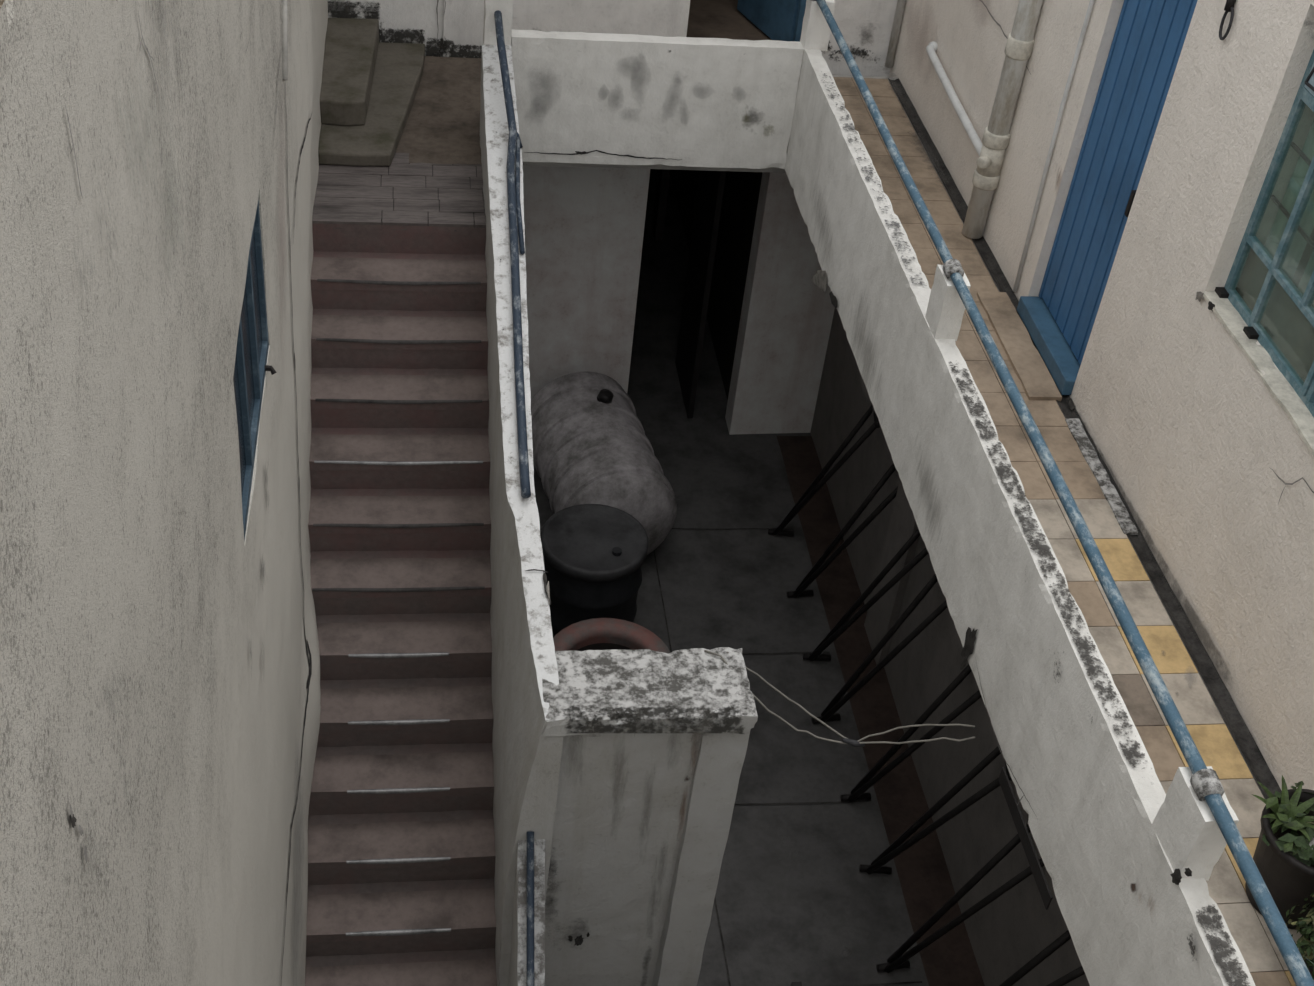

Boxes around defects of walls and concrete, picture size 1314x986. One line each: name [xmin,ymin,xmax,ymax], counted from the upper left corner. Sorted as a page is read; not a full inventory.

crack [245,3,312,502]
crack [526,150,677,160]
peeling [821,71,927,286]
peeling [949,362,1147,767]
crack [1269,467,1314,504]
crack [281,624,312,981]
peeling [1196,905,1250,986]